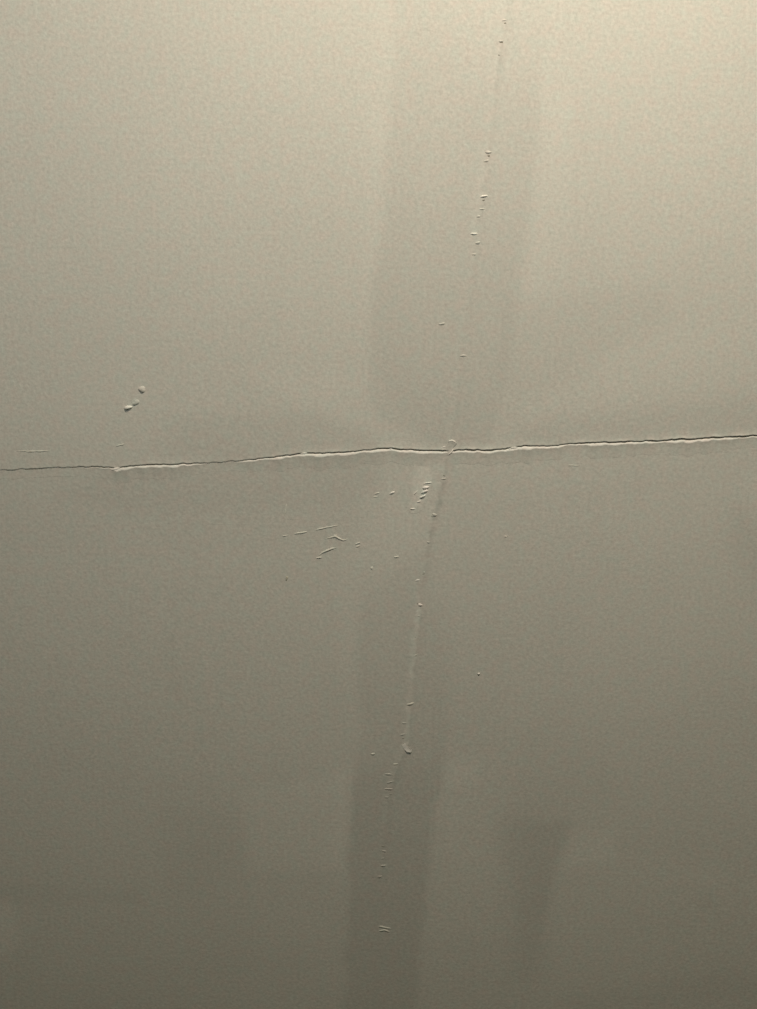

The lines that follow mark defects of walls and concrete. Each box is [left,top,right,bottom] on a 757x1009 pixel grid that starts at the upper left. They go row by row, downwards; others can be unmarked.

crack [0,428,757,484]